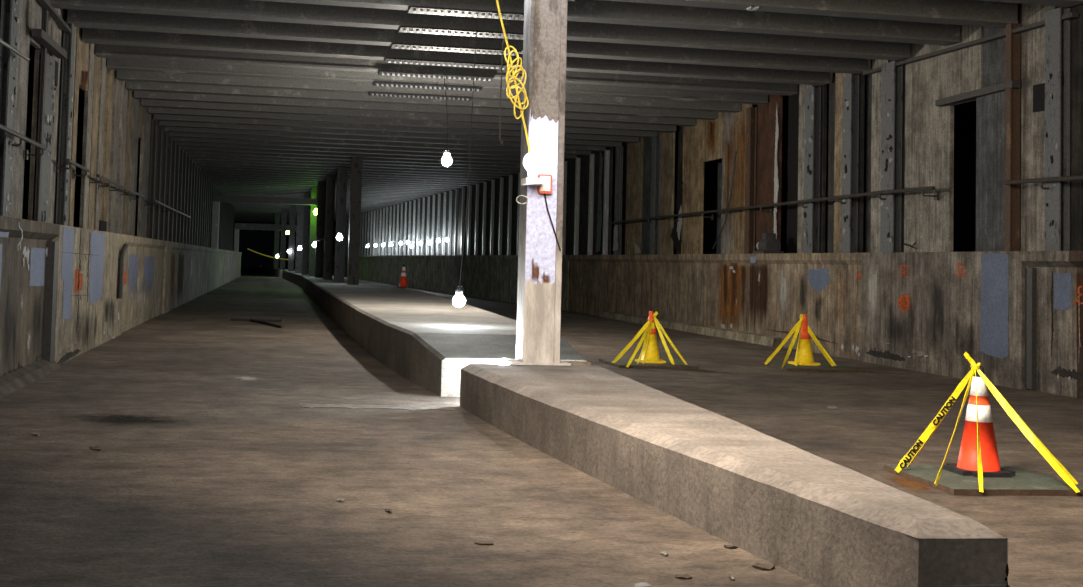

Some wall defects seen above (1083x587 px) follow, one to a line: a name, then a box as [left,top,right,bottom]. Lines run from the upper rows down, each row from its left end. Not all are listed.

rust [718,264,767,324]